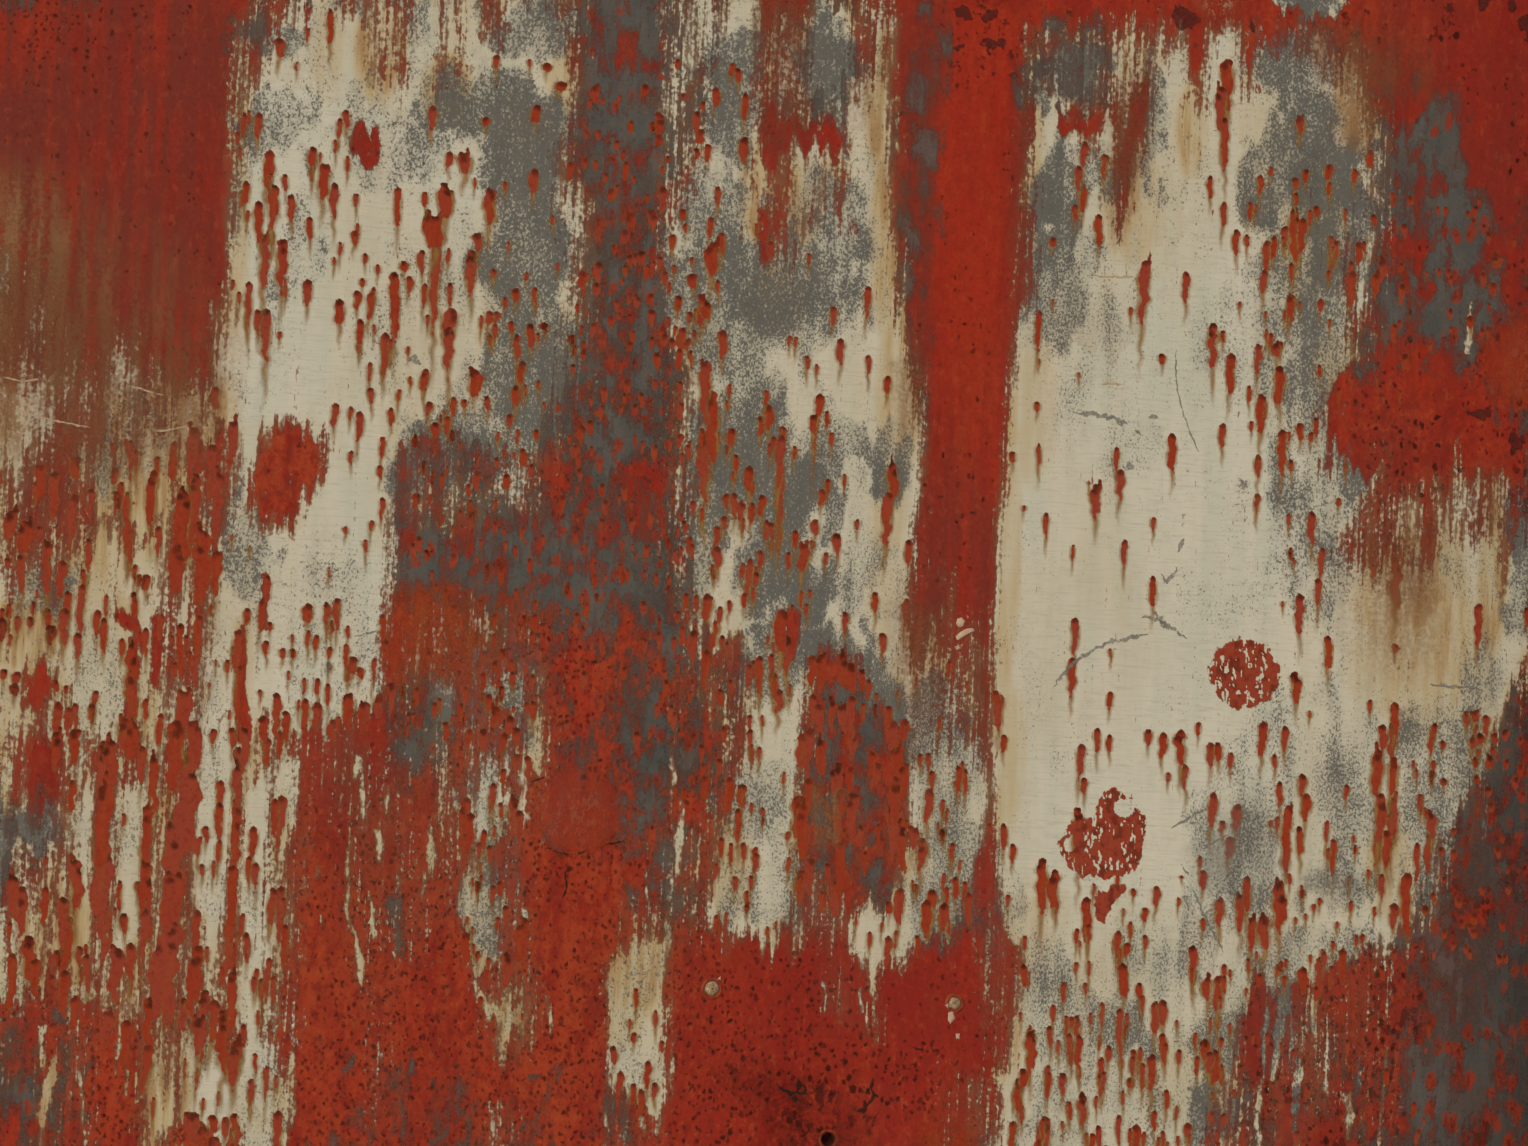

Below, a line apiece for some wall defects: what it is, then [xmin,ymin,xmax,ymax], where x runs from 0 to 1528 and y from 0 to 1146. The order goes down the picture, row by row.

corrosion [0,105,570,1146]
peeling [0,0,605,1146]
corrosion [609,982,666,1119]
corrosion [557,112,973,970]
peeling [599,0,1528,1146]
corrosion [1066,617,1080,703]
corrosion [1072,141,1109,254]
corrosion [1087,447,1126,531]
corrosion [1128,253,1152,353]
corrosion [1007,636,1486,1146]
corrosion [1205,59,1410,524]
corrosion [1281,511,1334,681]